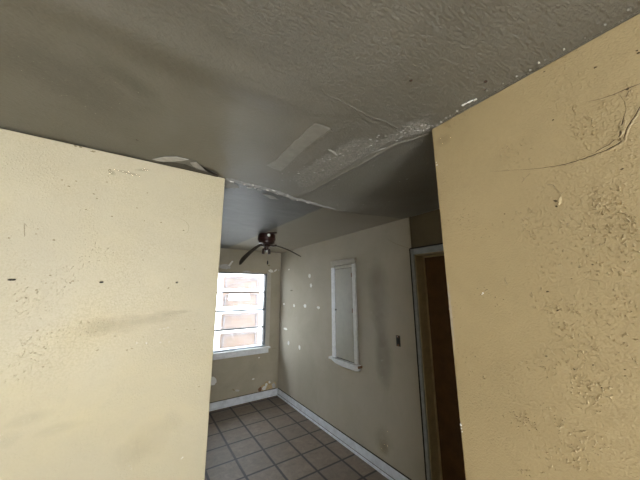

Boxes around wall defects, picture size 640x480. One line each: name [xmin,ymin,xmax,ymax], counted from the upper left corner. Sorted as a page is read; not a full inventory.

peeling [267,123,333,171]
spalling [225,178,402,219]
spalling [293,8,640,188]
crack [506,83,640,194]